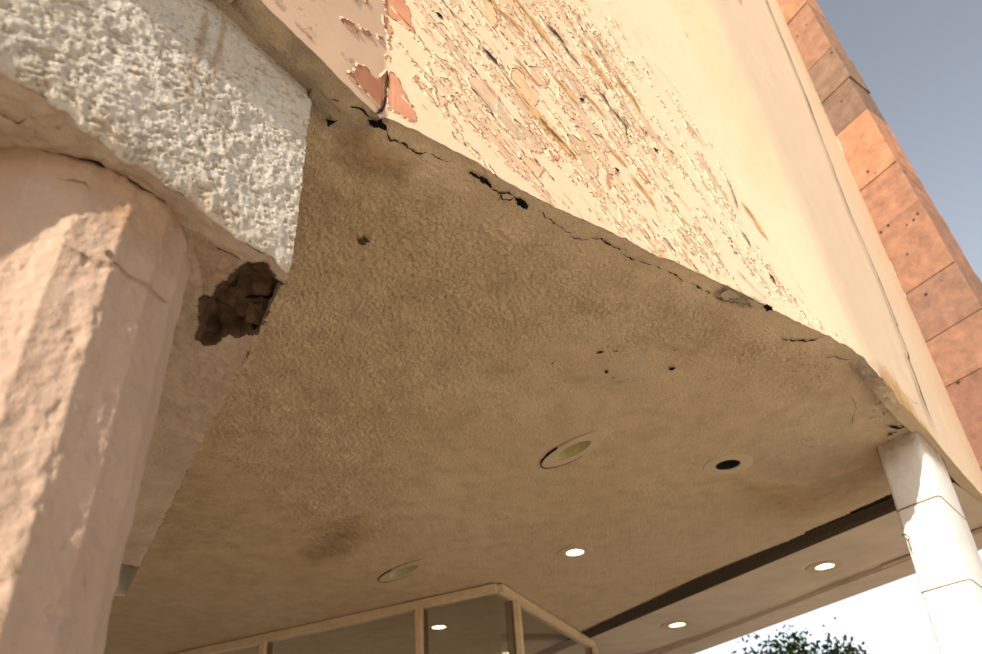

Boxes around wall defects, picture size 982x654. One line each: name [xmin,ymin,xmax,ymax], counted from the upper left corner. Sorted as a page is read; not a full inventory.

crack [43,150,244,263]
spalling [194,261,287,346]
crack [326,73,802,307]
peeling [339,0,840,343]
crack [442,0,768,247]